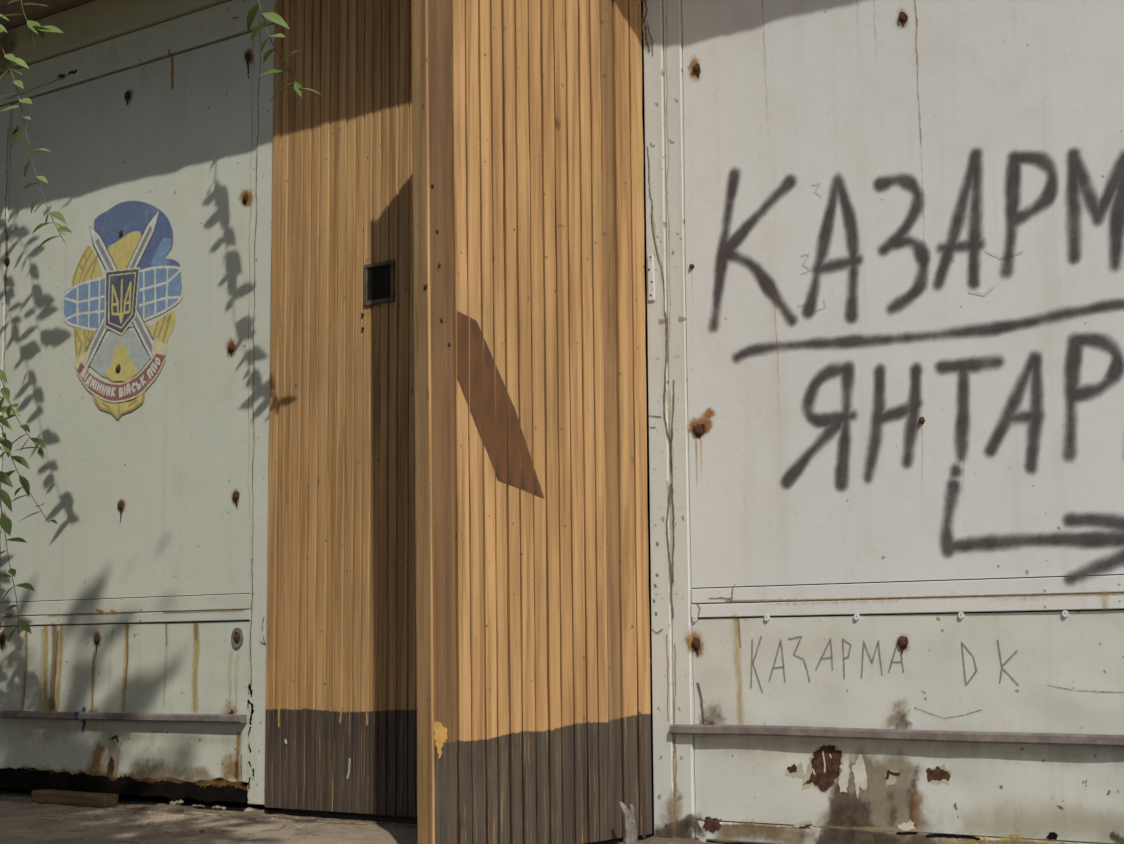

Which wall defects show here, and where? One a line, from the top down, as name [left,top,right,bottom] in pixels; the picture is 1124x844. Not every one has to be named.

corrosion [689,59,700,78]
corrosion [689,408,714,460]
corrosion [43,609,135,712]
corrosion [164,610,244,711]
corrosion [687,633,702,657]
corrosion [0,734,248,803]
corrosion [654,800,805,839]
peeling [785,744,867,799]
leakage [816,754,933,844]
peeling [885,768,900,786]
peeling [925,764,951,785]